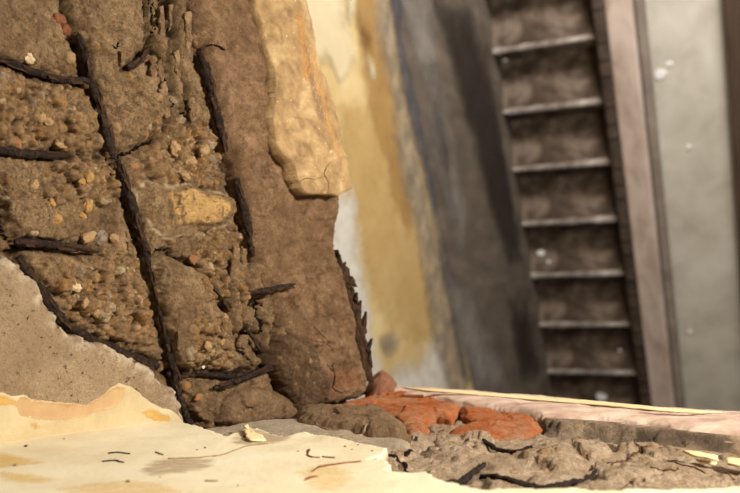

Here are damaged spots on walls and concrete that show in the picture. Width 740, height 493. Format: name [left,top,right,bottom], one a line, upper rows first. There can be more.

peeling [0,383,185,443]
spalling [0,0,287,388]
water stain [343,0,503,390]
spalling [179,0,740,491]
water stain [443,11,518,259]
water stain [513,312,537,373]